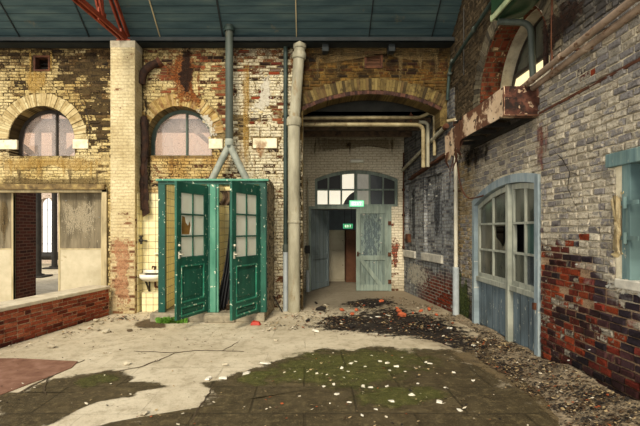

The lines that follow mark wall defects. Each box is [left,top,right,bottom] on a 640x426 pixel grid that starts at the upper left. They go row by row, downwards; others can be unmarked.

spalling [157,65,178,93]
spalling [190,53,225,139]
damp [460,142,490,175]
crack [554,151,579,204]
spalling [113,236,132,309]
crack [112,343,244,372]